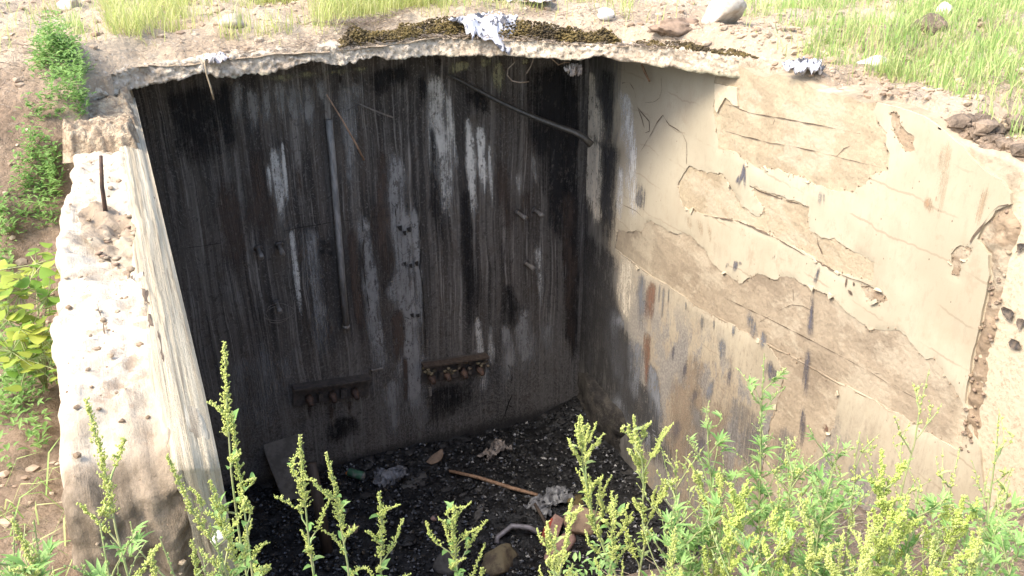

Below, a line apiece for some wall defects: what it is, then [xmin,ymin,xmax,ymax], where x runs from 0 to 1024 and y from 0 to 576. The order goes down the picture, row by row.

crack [623,82,687,164]
peeling [713,66,915,193]
water stain [167,64,553,389]
water stain [358,156,473,433]
water stain [522,59,760,471]
rust [645,281,656,316]
peeling [677,166,887,306]
peeling [616,208,1024,500]
water stain [777,410,805,463]